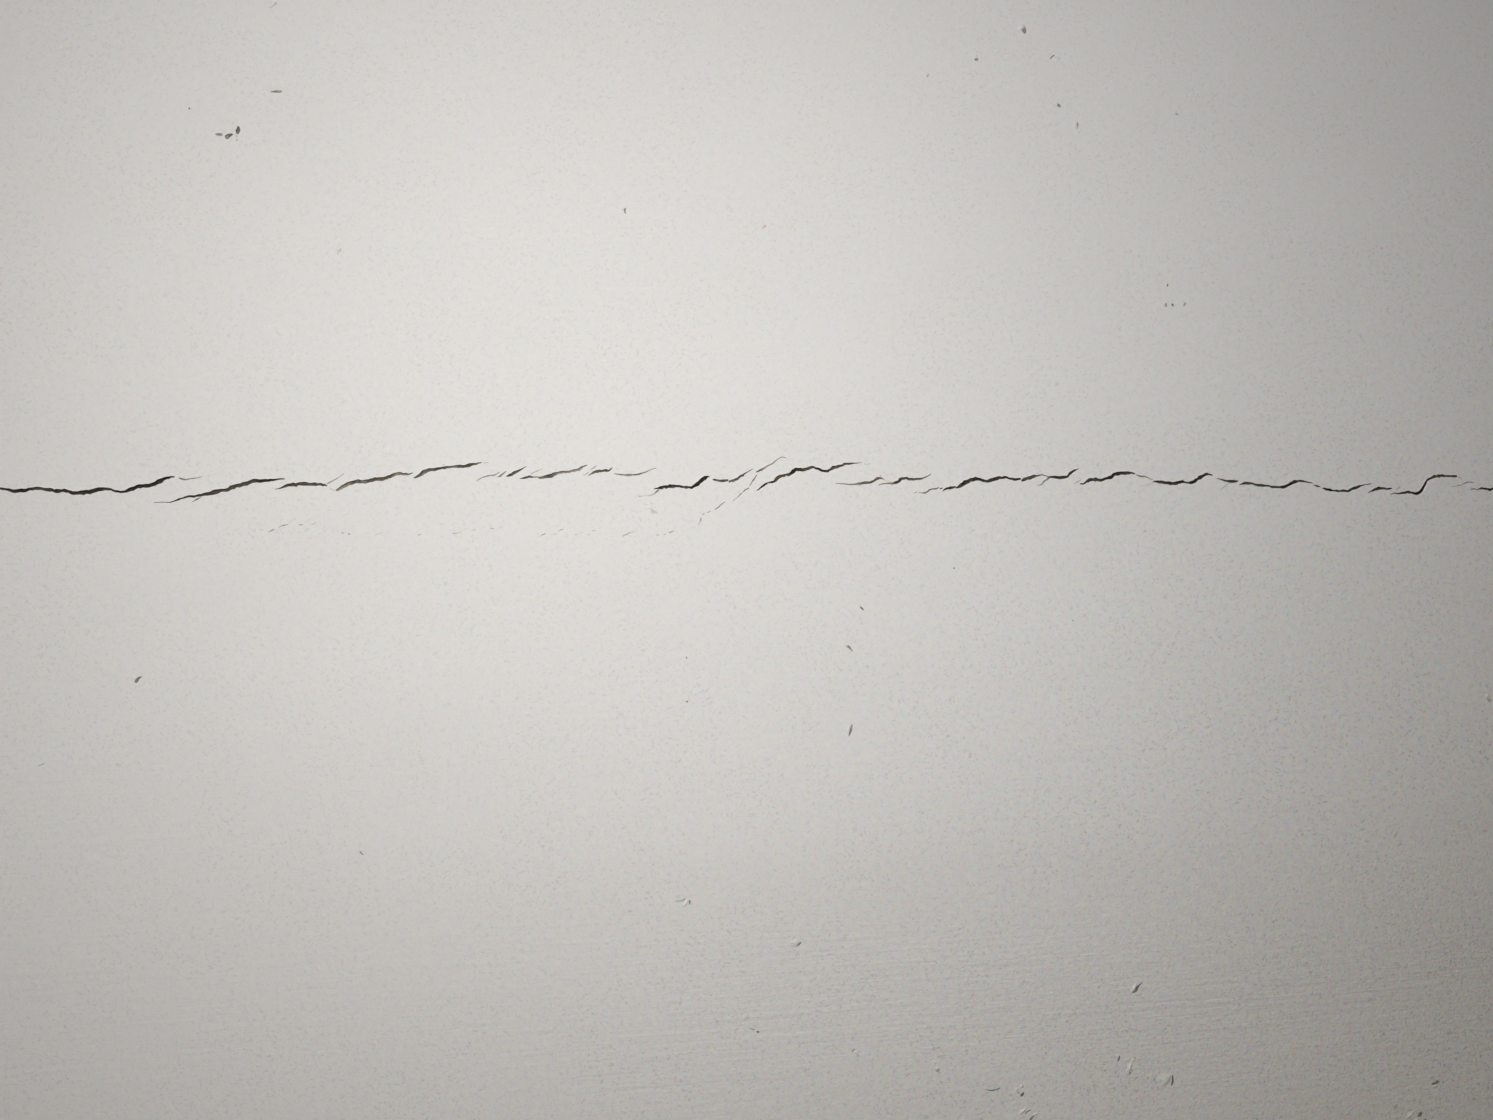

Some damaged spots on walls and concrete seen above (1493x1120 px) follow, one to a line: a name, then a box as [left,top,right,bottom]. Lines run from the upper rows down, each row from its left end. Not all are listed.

crack [0,457,1493,536]